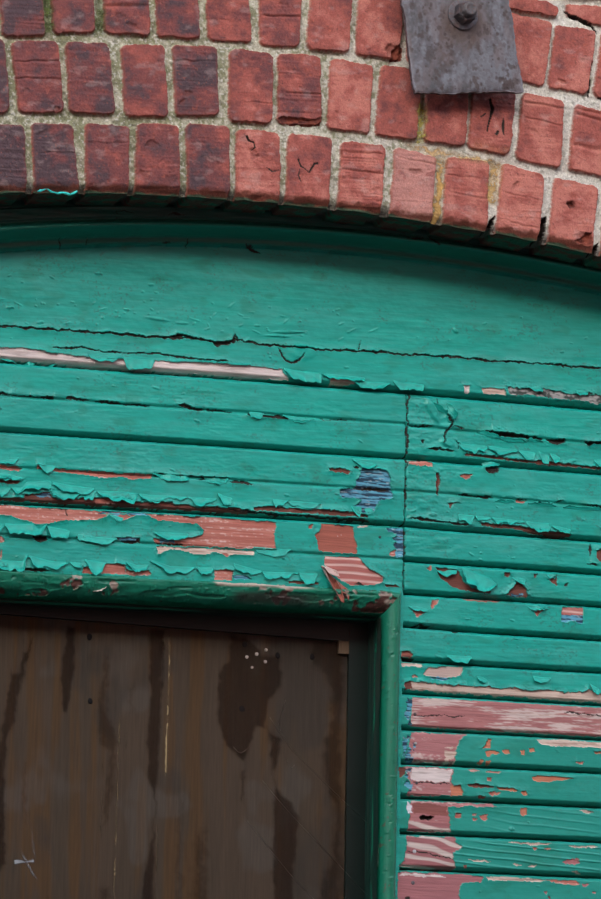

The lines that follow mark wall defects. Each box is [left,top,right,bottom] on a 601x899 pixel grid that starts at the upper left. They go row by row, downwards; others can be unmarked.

crack [563,11,597,33]
crack [268,158,319,182]
peeling [0,347,424,391]
crack [0,324,601,370]
peeling [482,387,601,405]
peeling [458,430,601,474]
peeling [408,461,441,495]
peeling [0,457,398,603]
peeling [411,493,601,540]
leakage [218,637,281,759]
peeling [397,650,601,899]
leakage [274,790,297,899]